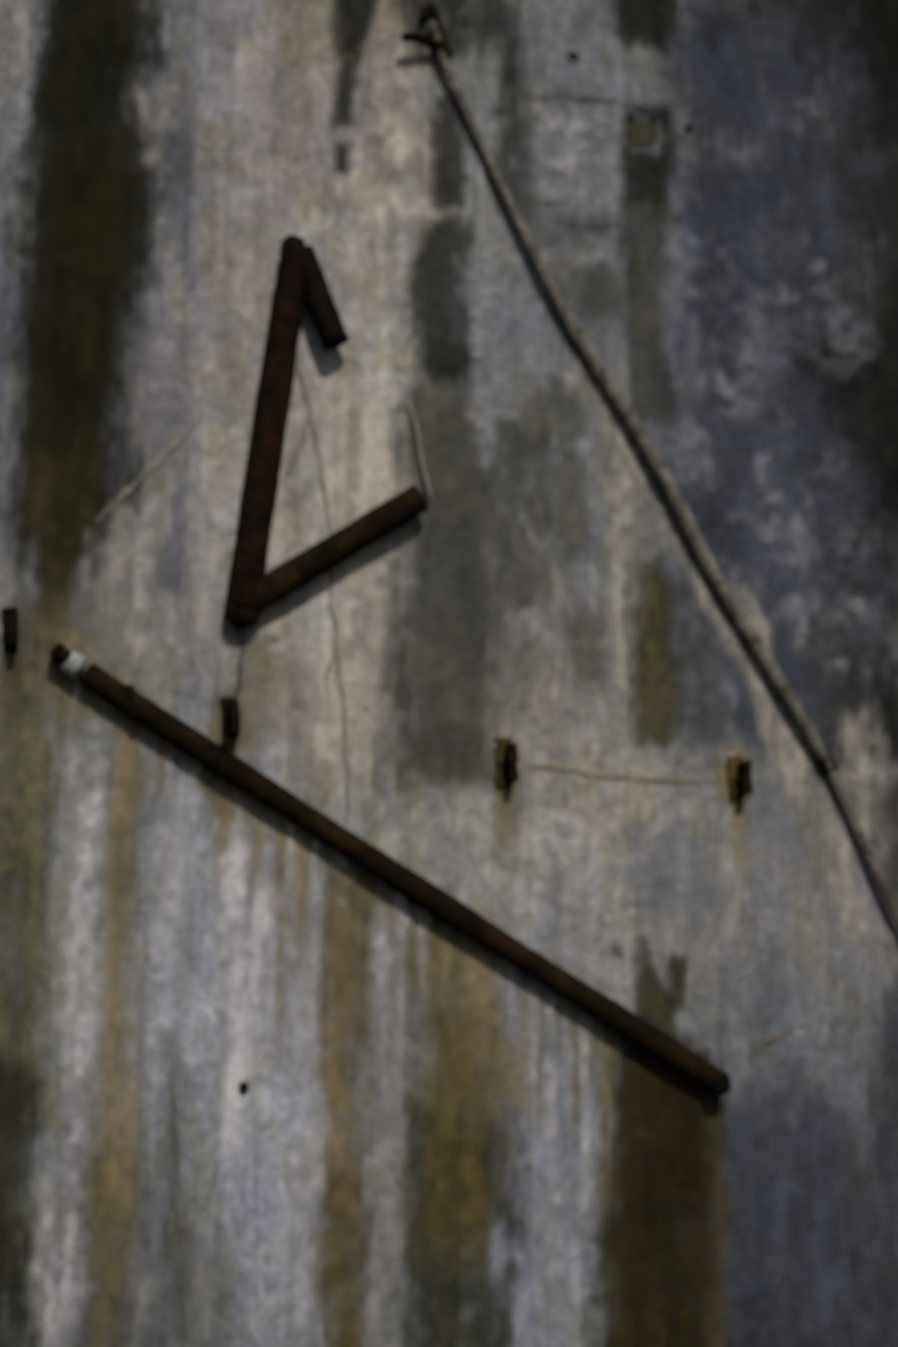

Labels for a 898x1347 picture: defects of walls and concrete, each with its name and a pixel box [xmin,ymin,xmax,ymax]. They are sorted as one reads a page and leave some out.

leakage [335,0,376,124]
leakage [13,0,187,649]
leakage [115,476,203,651]
leakage [303,39,587,784]
leakage [535,0,898,940]
leakage [0,1063,37,1347]
leakage [222,848,270,1135]
rust [276,825,308,1011]
rust [323,1146,365,1347]
rust [323,871,414,1109]
rust [405,917,517,1347]
rust [574,1015,724,1347]